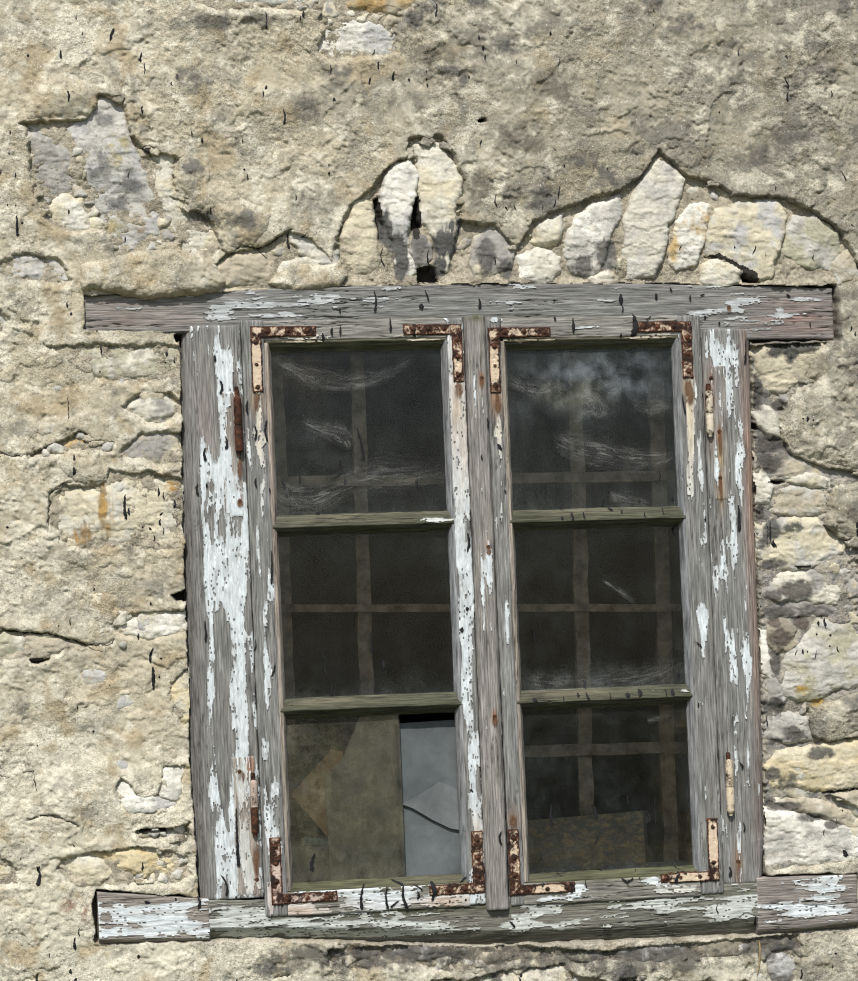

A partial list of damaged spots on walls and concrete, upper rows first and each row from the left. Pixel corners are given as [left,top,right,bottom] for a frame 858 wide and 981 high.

spalling [25,92,858,320]
spalling [49,344,181,382]
spalling [35,393,184,550]
crack [1,629,114,646]
peeling [98,325,480,939]
peeling [480,531,493,631]
spalling [687,293,858,870]
spalling [57,825,196,888]
peeling [499,812,852,935]
spalling [328,934,808,981]